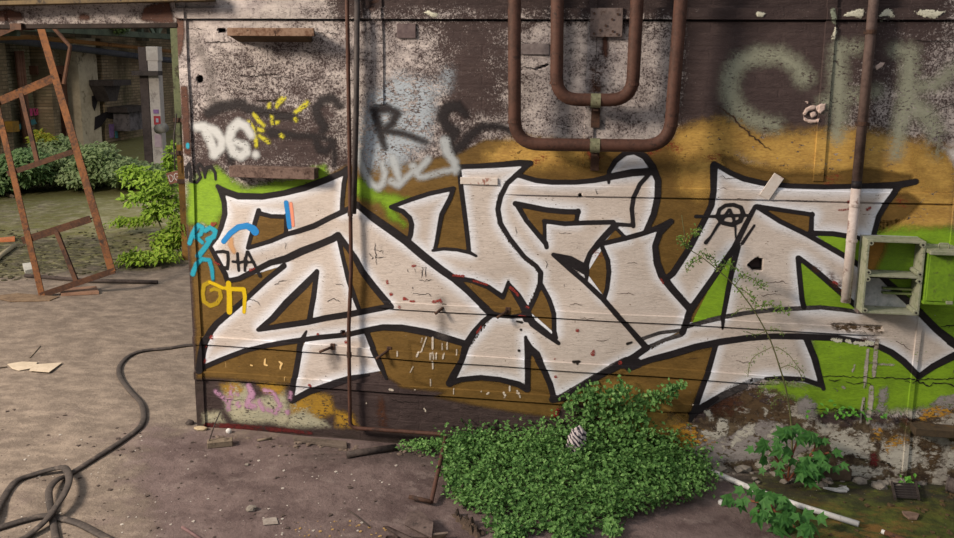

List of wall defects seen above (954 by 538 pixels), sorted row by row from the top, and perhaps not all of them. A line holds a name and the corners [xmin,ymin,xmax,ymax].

peeling [830,8,865,40]
peeling [914,9,945,19]
corrosion [591,68,602,93]
peeling [797,395,818,418]
peeling [669,407,812,463]
peeling [828,394,954,477]